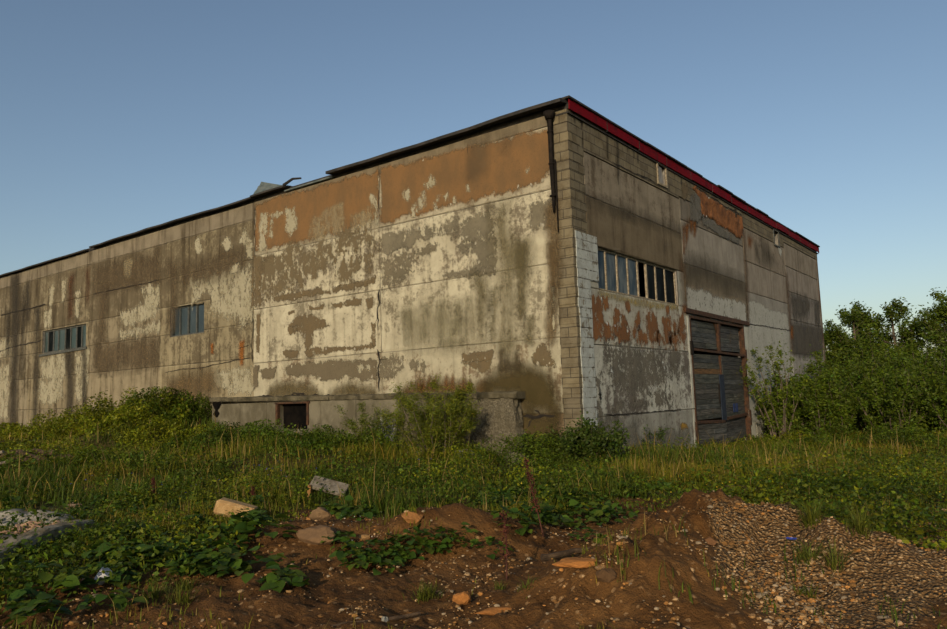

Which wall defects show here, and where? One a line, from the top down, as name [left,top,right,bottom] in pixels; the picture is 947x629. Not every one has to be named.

damp [6,275,40,426]
peeling [119,320,161,340]
peeling [142,283,160,310]
peeling [230,130,552,389]
damp [476,201,560,446]
peeling [591,293,687,420]
spalling [682,182,743,244]